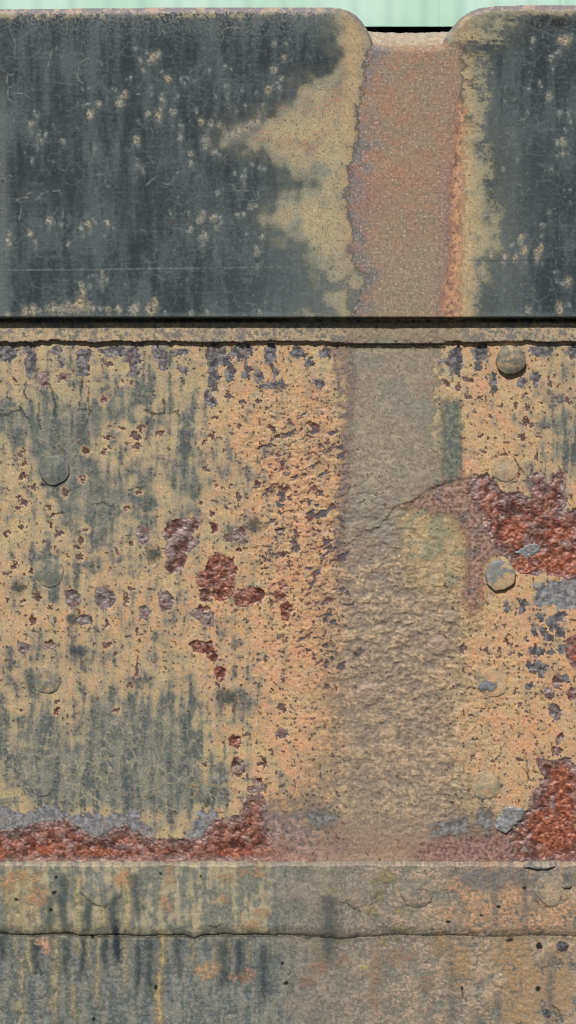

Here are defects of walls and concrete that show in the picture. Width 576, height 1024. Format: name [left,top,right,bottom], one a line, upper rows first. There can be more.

peeling [195,10,372,327]
corrosion [343,40,468,325]
peeling [0,343,373,855]
corrosion [0,329,576,882]
damp [0,870,39,1024]
damp [47,875,194,1024]
damp [213,941,266,985]
corrosion [439,878,575,1023]